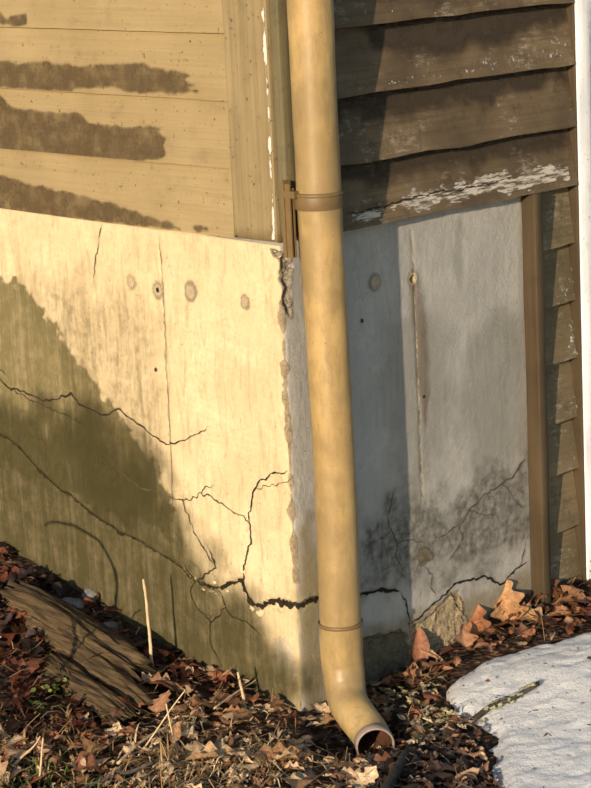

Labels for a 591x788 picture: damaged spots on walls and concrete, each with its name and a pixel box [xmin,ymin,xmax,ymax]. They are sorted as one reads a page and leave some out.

leakage [0,15,26,26]
leakage [0,62,197,93]
leakage [0,97,165,161]
leakage [0,176,173,229]
peeling [352,164,570,222]
crack [0,370,208,445]
spalling [270,194,299,583]
crack [0,434,319,662]
crack [360,456,529,625]
leakage [366,472,530,581]
spalling [363,591,464,686]